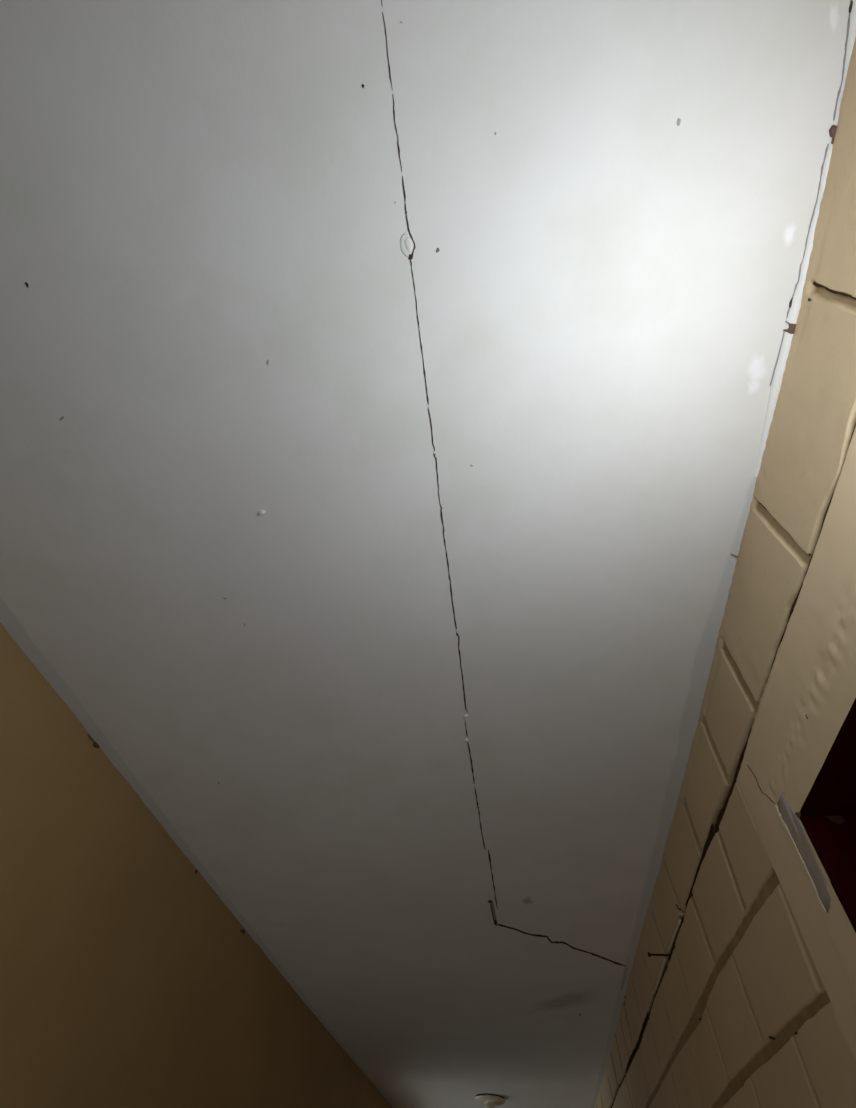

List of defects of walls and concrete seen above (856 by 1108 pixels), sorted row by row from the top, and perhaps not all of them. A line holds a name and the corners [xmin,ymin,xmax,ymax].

crack [381,0,628,990]
crack [610,493,834,1108]
crack [770,0,856,386]